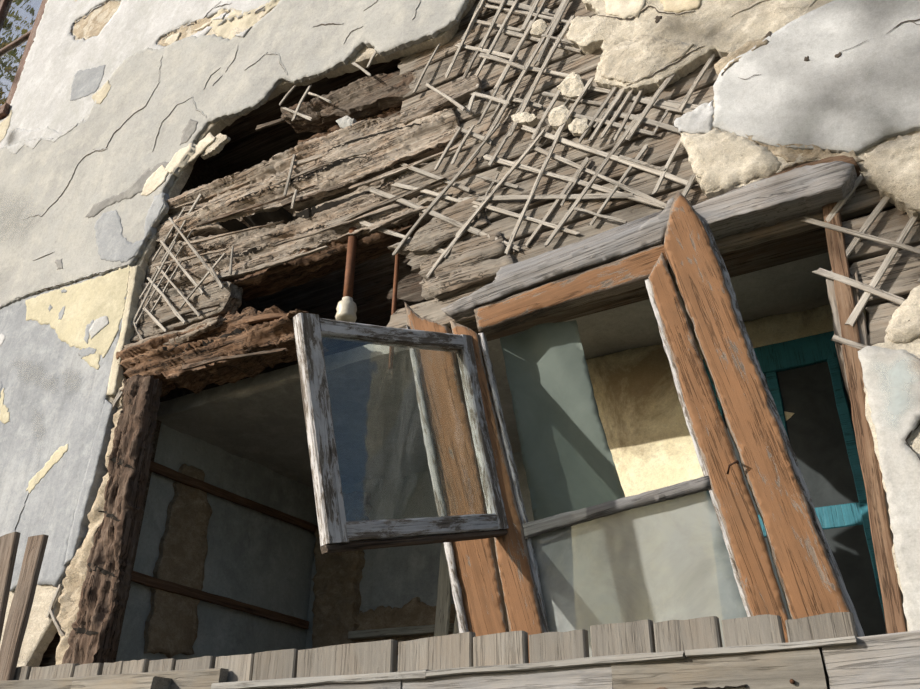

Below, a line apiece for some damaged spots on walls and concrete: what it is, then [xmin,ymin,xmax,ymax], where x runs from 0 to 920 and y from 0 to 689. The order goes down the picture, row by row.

flaking render [73,1,120,39]
flaking render [158,0,280,47]
crack [313,0,378,44]
flaking render [604,0,646,19]
flaking render [654,0,702,23]
crack [731,0,769,17]
crack [22,0,231,220]
crack [152,45,288,152]
flaking render [674,100,714,134]
crack [196,122,423,263]
peeling [25,119,216,370]
peeling [26,444,68,494]